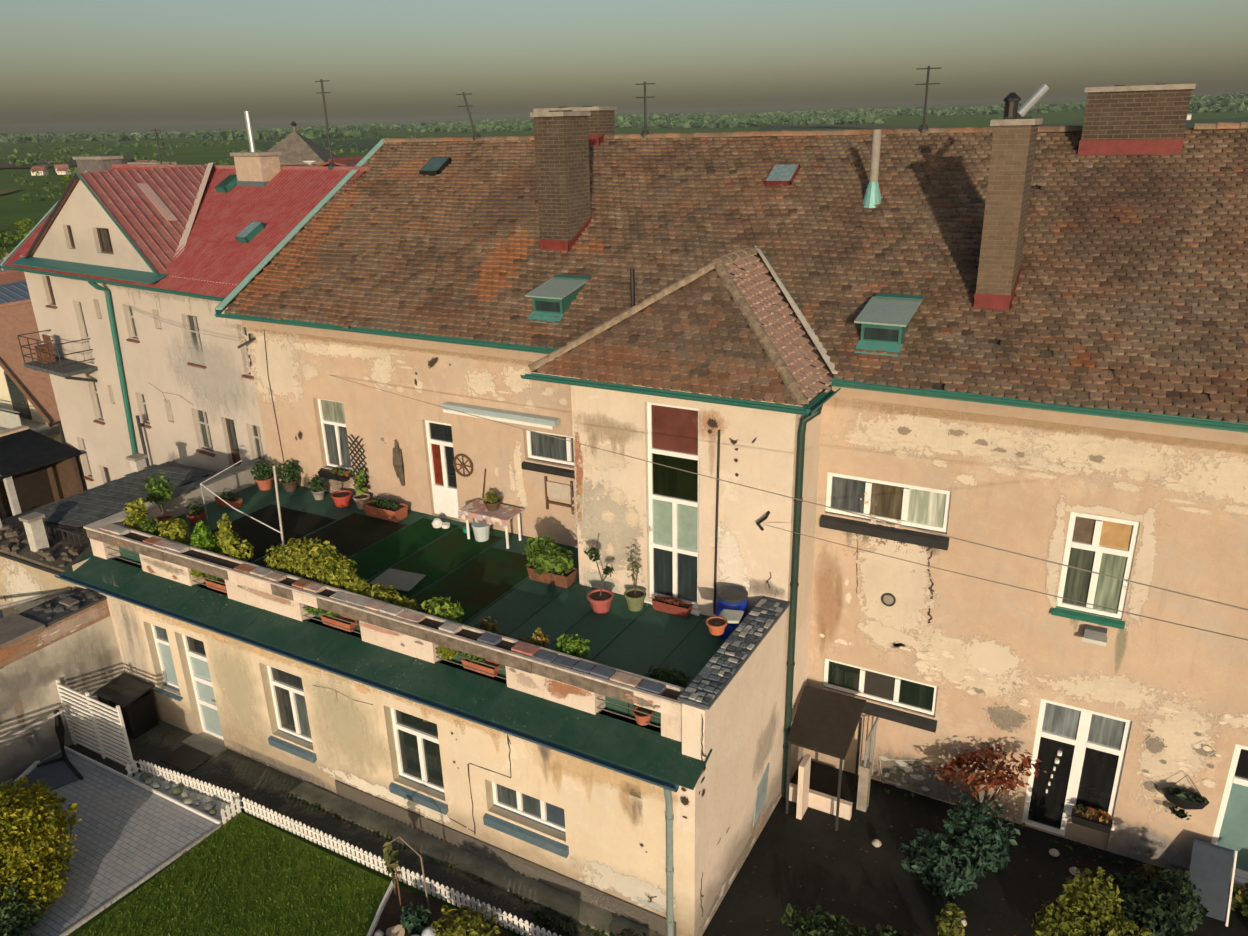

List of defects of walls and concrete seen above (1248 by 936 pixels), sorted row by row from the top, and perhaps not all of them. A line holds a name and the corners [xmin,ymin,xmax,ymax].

peeling [275,341,451,394]
peeling [463,363,568,409]
peeling [824,404,1248,631]
crack [925,547,934,623]
flaking render [509,668,593,699]
peeling [819,605,1248,822]
crack [449,734,511,835]